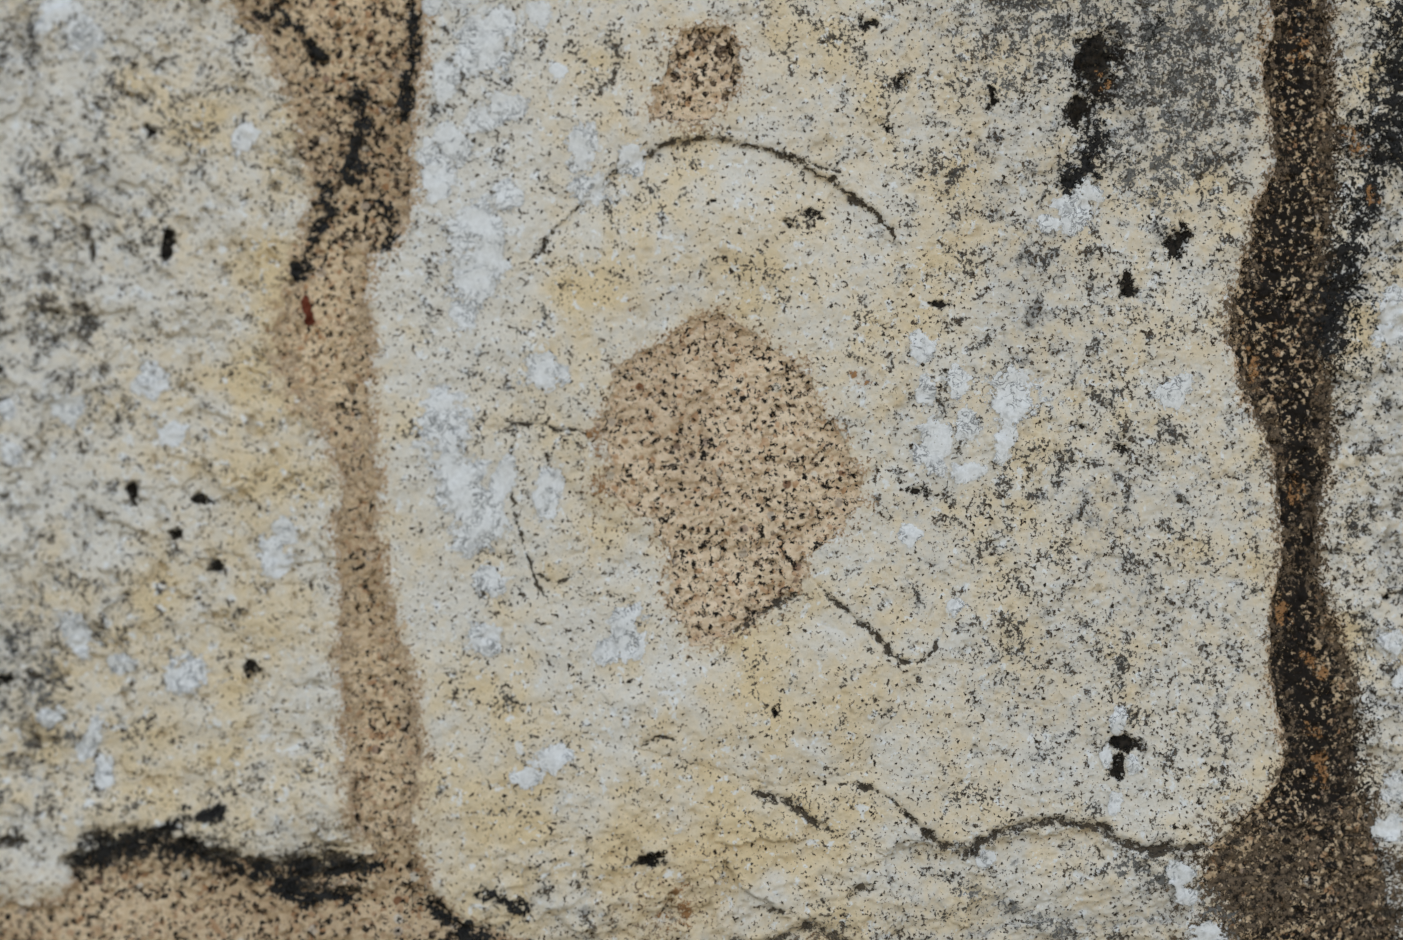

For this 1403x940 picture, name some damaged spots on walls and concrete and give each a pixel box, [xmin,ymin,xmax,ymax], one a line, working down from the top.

spalling [649,24,742,126]
crack [531,135,895,259]
spalling [593,313,864,646]
crack [751,790,835,833]
crack [838,781,1244,881]